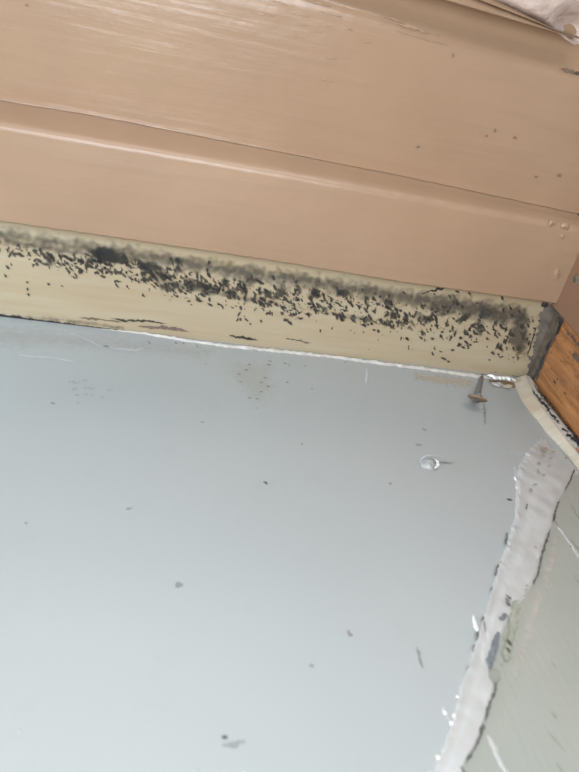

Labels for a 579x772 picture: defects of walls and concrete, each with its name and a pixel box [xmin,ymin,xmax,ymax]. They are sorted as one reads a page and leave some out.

leakage [0,232,579,380]